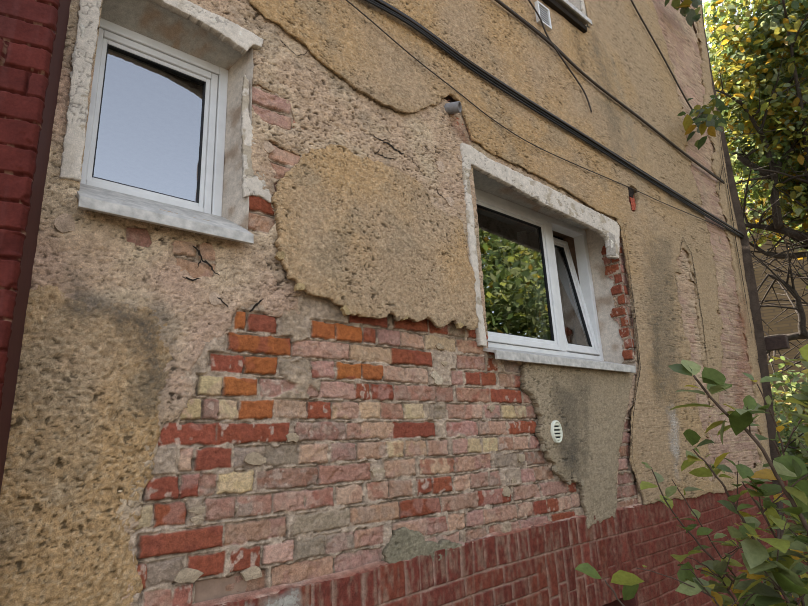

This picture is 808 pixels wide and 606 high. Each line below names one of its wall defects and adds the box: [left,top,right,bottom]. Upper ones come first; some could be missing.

crack [184,246,219,281]
spalling [31,0,643,606]
peeling [652,0,761,481]